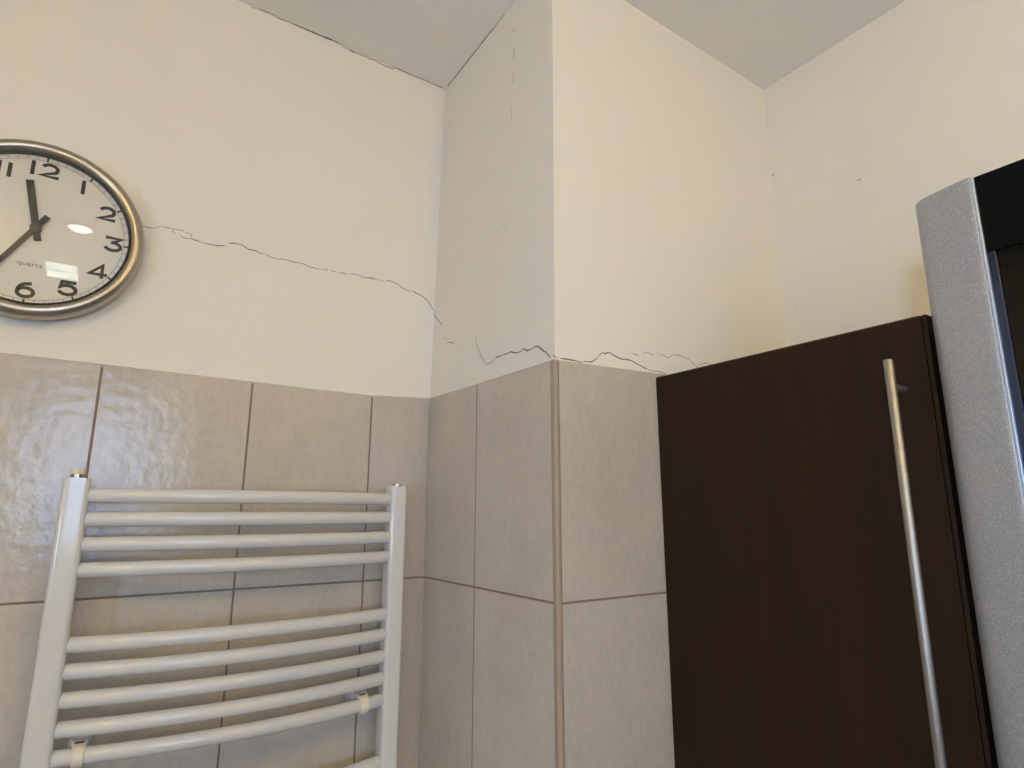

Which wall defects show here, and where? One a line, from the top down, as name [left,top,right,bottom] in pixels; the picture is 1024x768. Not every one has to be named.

crack [252,7,515,88]
crack [143,226,711,375]